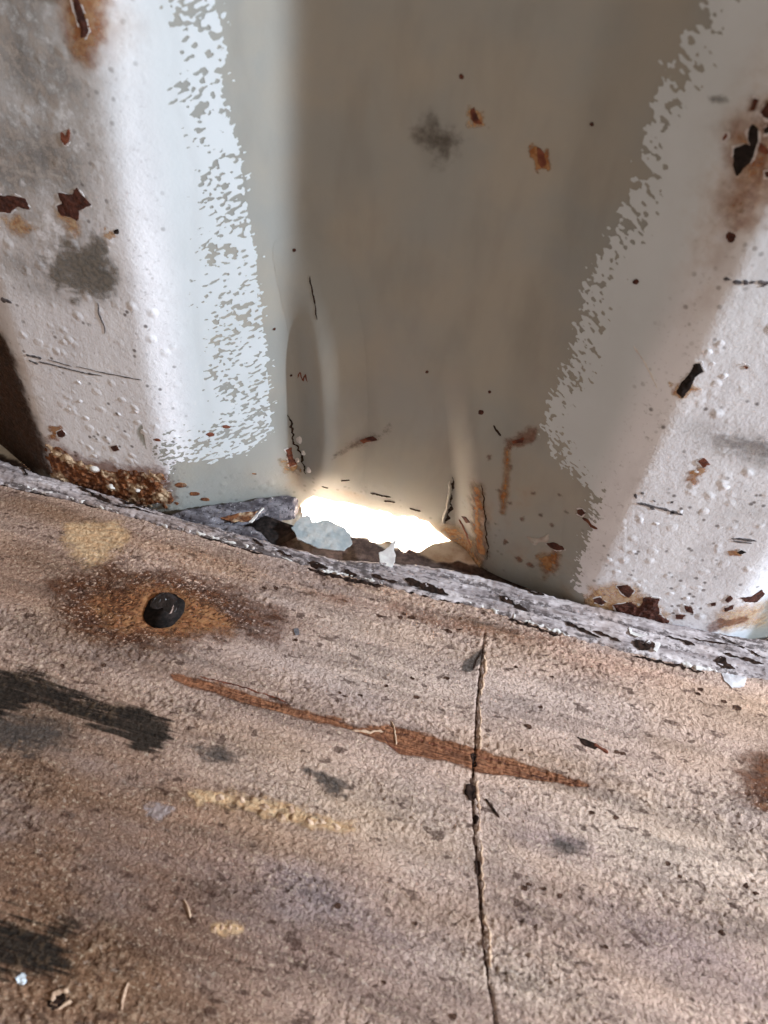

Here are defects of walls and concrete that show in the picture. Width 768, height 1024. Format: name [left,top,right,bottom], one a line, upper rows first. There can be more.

corrosion [65,0,105,64]
corrosion [0,193,31,234]
corrosion [55,188,92,238]
peeling [98,0,277,491]
corrosion [529,145,550,173]
corrosion [720,95,768,243]
peeling [538,0,754,599]
corrosion [0,335,210,510]
corrosion [48,563,281,650]
corrosion [587,584,694,624]
damp [0,666,174,757]
crack [464,633,500,1024]